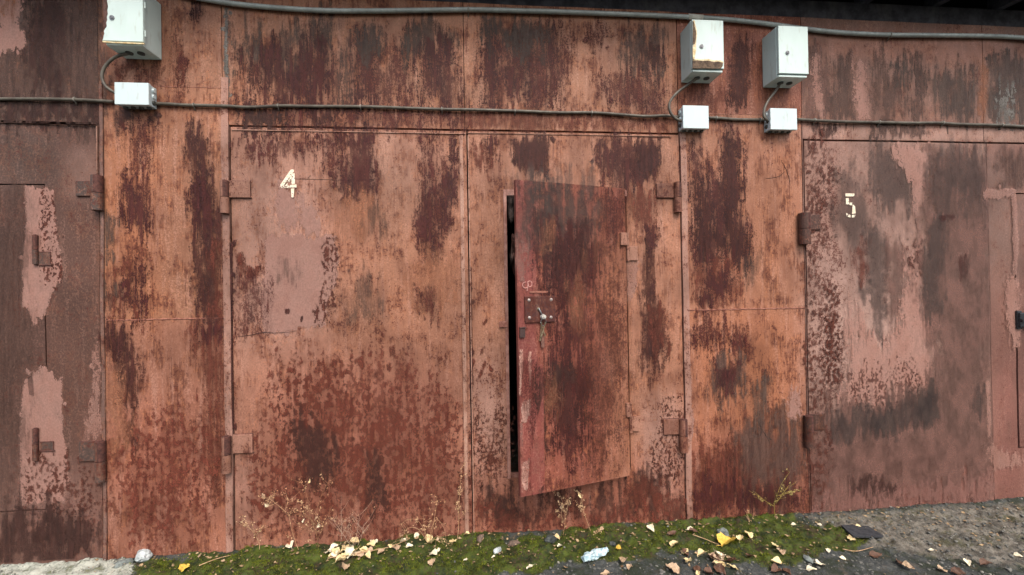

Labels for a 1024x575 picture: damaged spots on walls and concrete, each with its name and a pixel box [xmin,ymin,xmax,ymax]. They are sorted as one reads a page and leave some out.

peeling [18,185,64,325]
rust [98,1,812,556]
peeling [18,365,108,525]